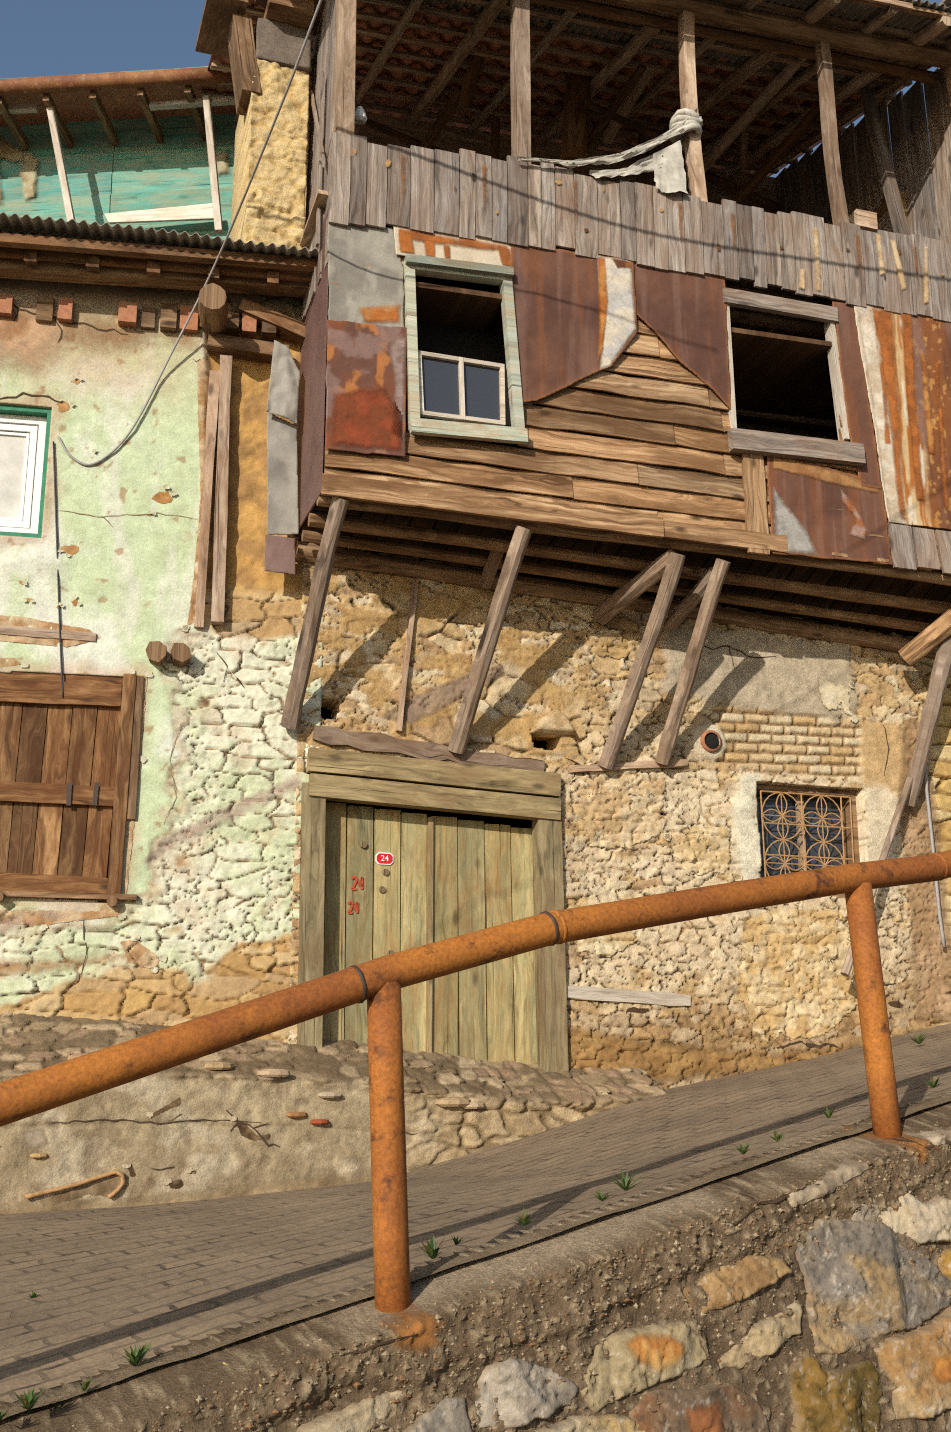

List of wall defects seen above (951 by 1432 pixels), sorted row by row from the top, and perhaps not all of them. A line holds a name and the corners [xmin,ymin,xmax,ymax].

corrosion [360,305,399,322]
corrosion [333,339,405,449]
corrosion [873,309,949,519]
corrosion [773,457,878,539]
crack [704,645,776,669]
corrosion [392,1310,438,1348]